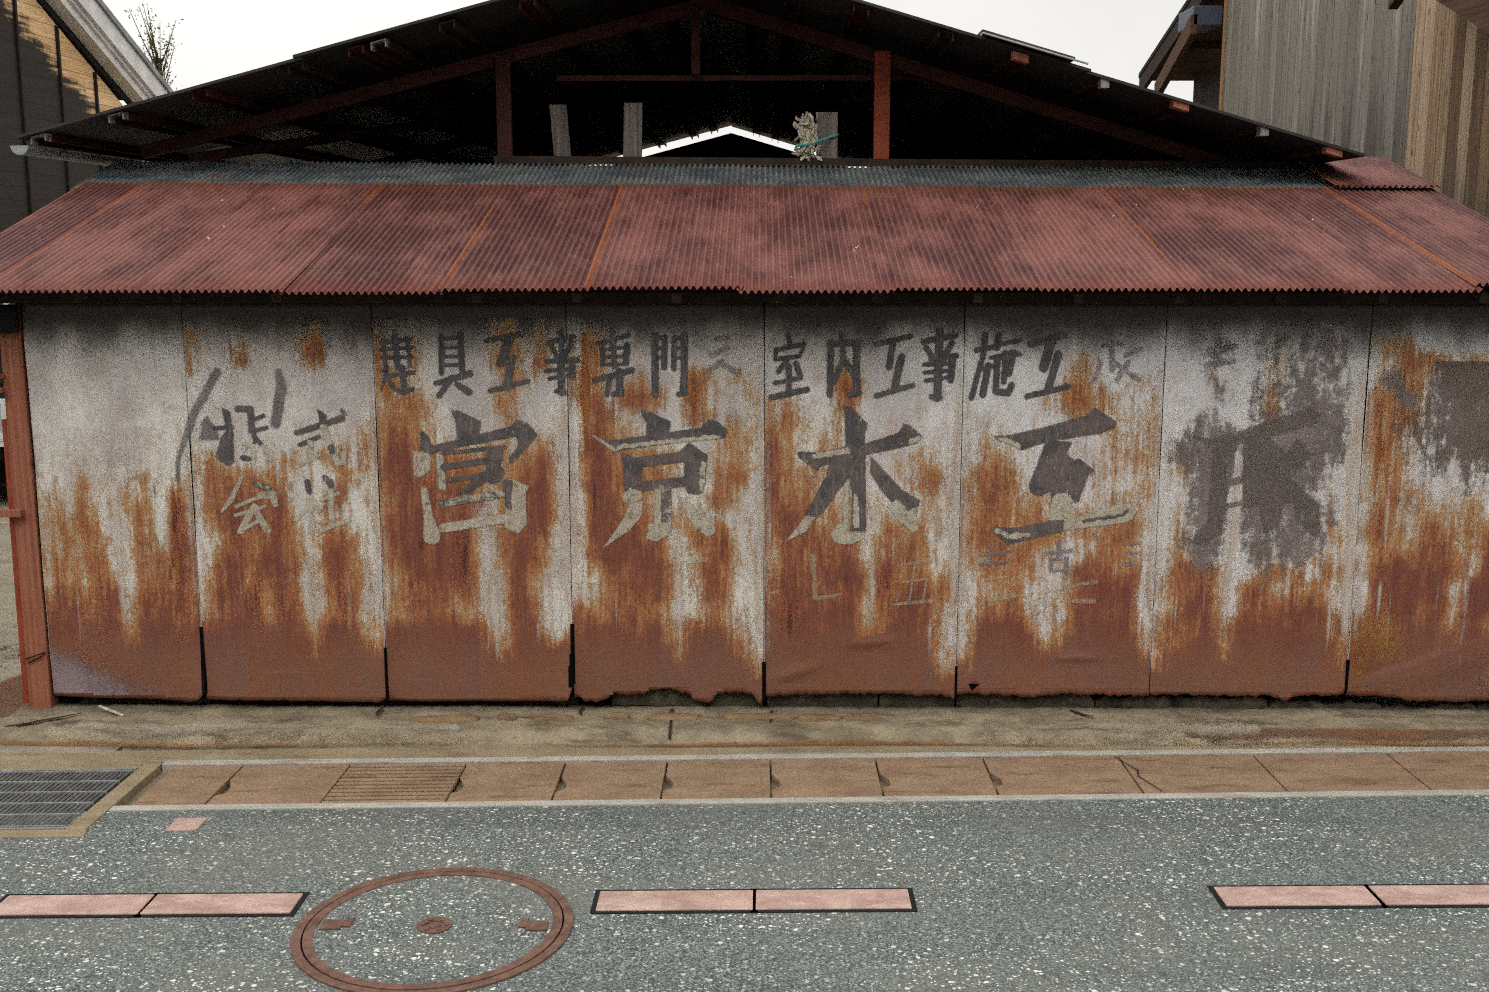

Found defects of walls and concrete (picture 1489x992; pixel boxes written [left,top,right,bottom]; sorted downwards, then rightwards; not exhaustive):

corrosion [37,318,1489,699]